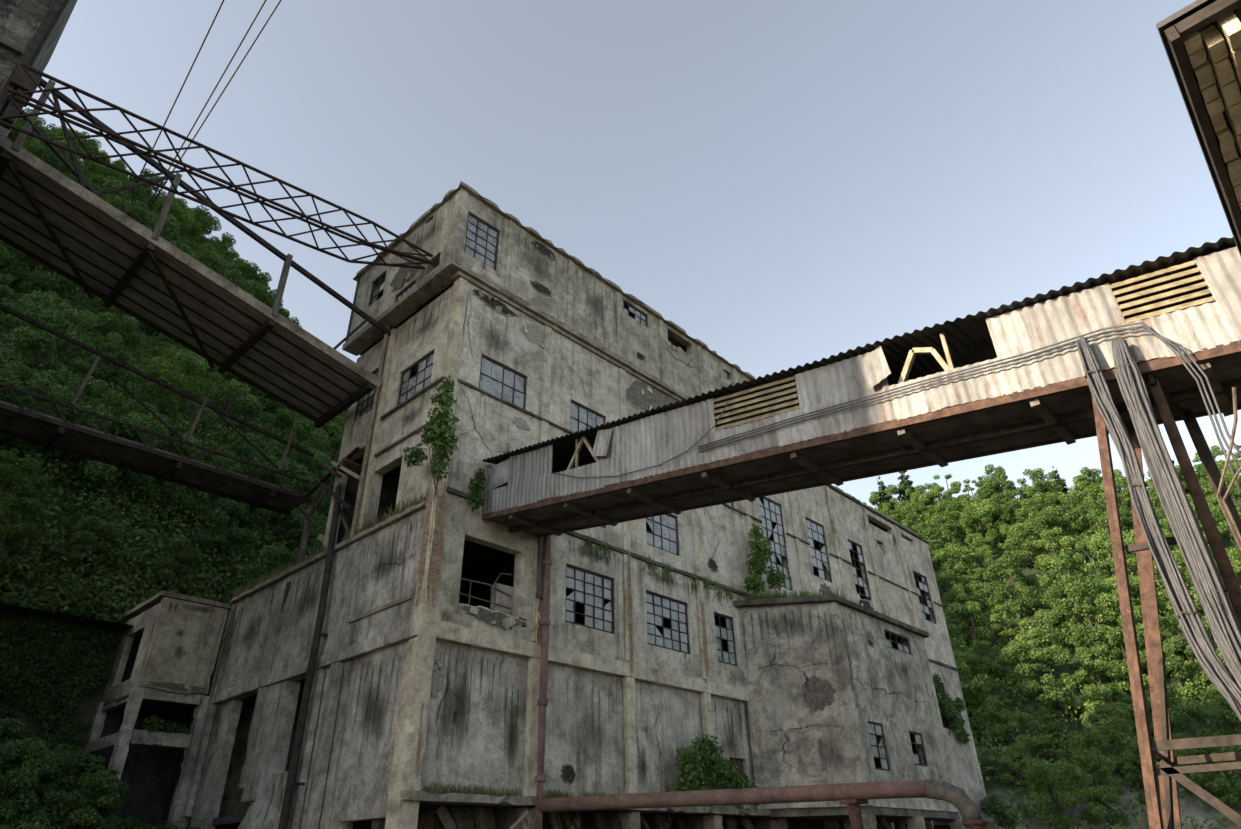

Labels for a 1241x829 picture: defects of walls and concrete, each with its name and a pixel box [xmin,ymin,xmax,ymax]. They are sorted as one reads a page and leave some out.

spalling [802,676,836,711]
crack [753,645,929,731]
crack [756,725,842,770]
rust [537,779,985,829]